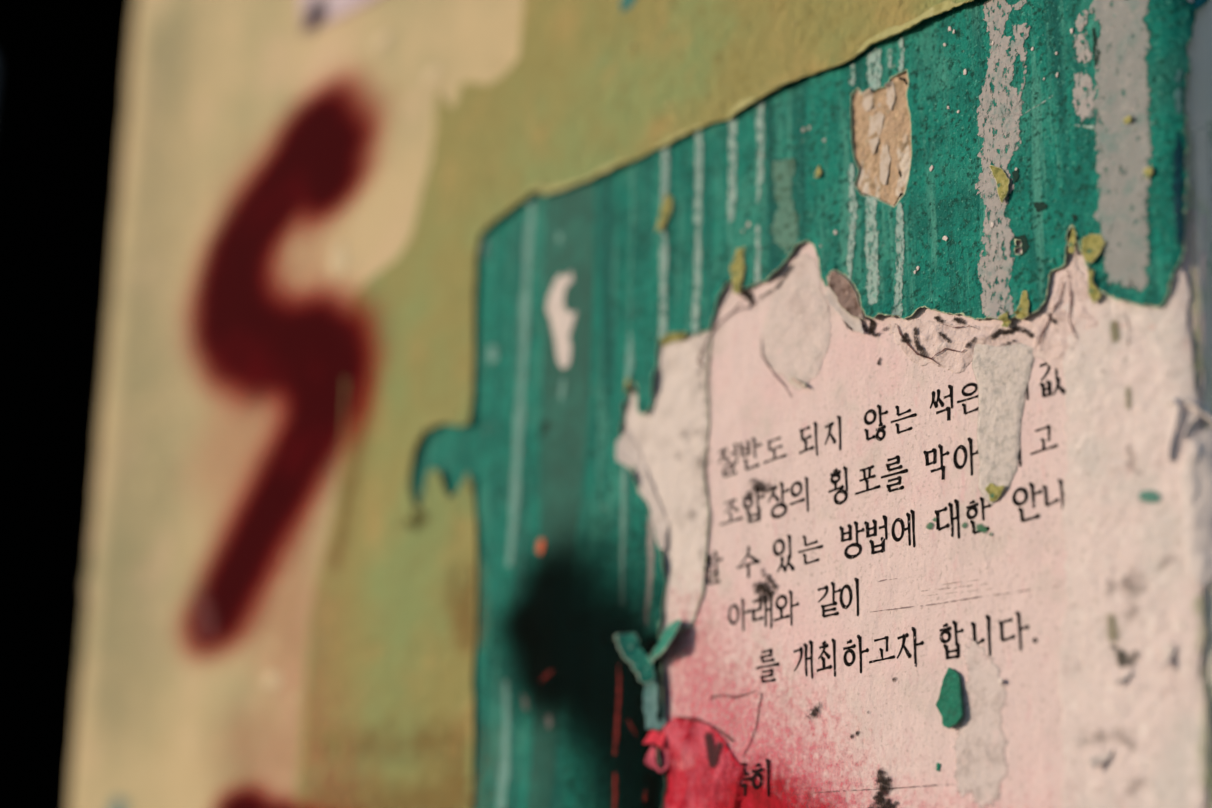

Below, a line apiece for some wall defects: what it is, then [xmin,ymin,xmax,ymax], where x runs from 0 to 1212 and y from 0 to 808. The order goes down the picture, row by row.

peeling [410,0,1212,808]